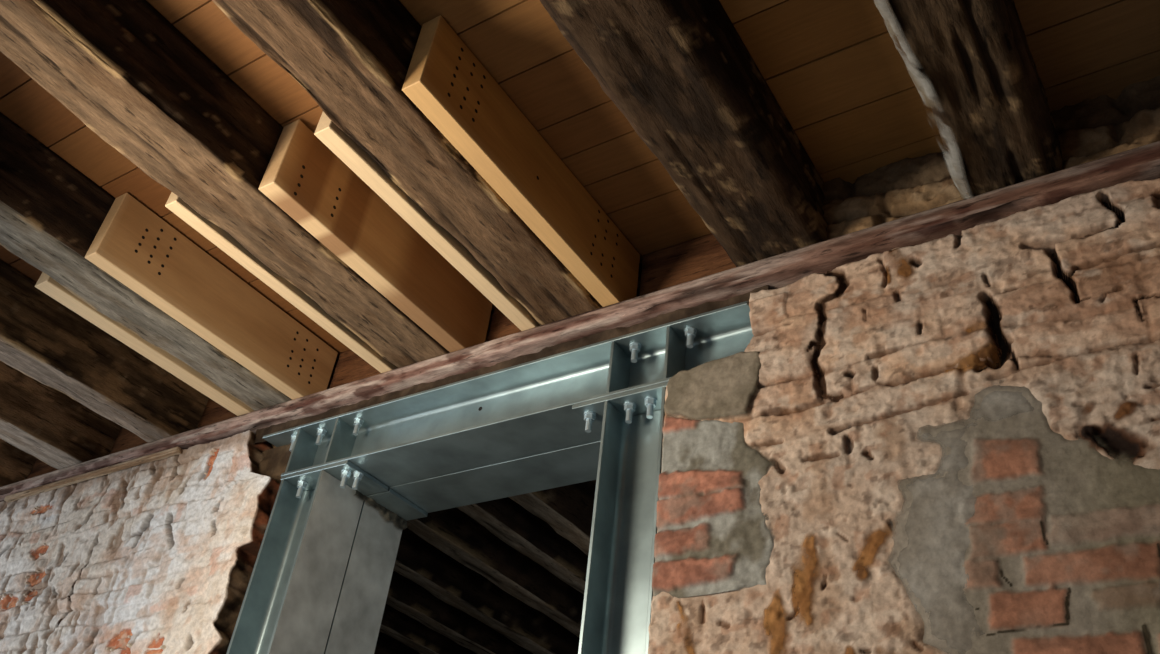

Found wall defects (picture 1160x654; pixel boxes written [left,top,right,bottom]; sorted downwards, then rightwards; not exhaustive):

crack [1085,201,1125,237]
crack [1051,253,1085,304]
crack [807,271,849,402]
crack [979,297,1019,372]
spalling [889,385,1160,654]